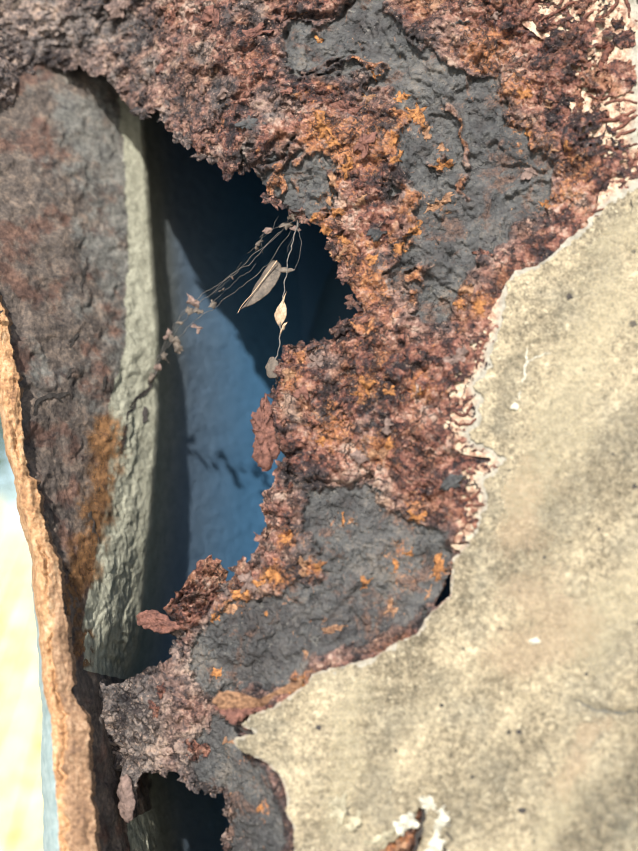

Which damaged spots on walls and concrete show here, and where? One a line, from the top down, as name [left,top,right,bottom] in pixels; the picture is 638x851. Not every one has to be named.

peeling [104,0,127,21]
peeling [611,16,626,30]
peeling [601,26,636,49]
spalling [296,219,360,346]
corrosion [250,393,280,471]
peeling [438,473,467,491]
corrosion [63,415,122,667]
peeling [0,295,101,851]
corrosion [136,555,229,634]
corrosion [211,678,304,725]
corrosion [116,774,136,823]
spalling [363,795,450,851]